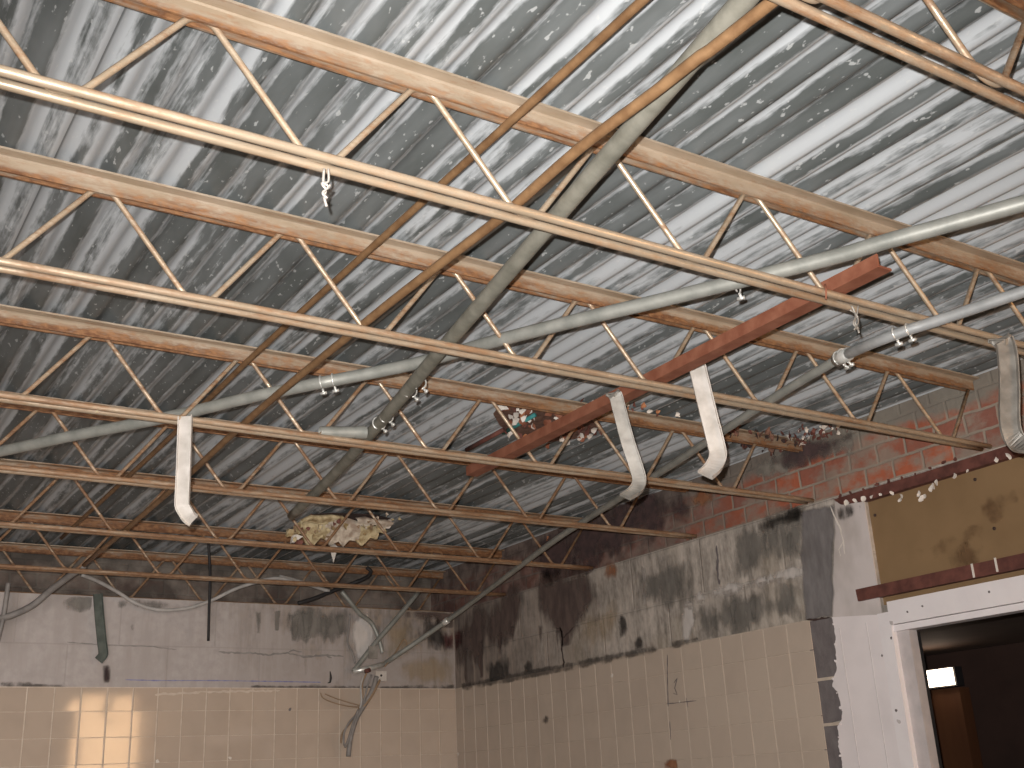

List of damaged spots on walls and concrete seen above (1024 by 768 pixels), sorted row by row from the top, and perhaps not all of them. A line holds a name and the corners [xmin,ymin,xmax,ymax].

peeling [917,479,938,502]
water stain [407,587,656,689]
water stain [538,570,593,646]
crack [559,626,574,668]
peeling [801,491,903,768]